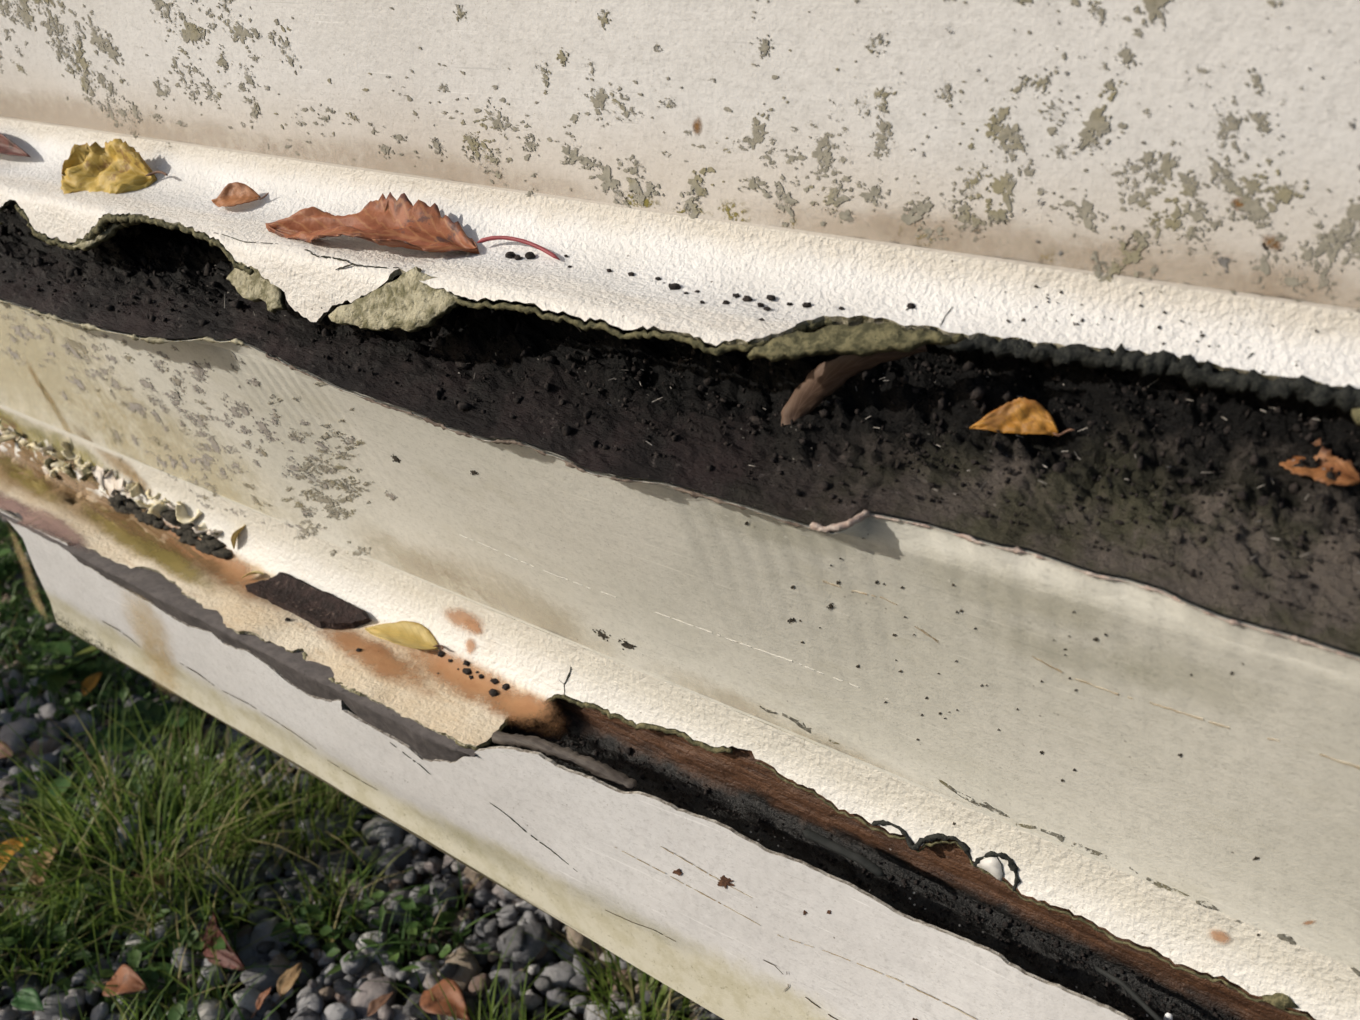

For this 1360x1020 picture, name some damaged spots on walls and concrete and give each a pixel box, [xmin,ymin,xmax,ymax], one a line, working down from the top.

peeling [0,0,1360,317]
spalling [328,266,1360,427]
water stain [0,417,258,596]
peeling [0,299,1360,660]
corrosion [448,611,481,652]
spalling [455,716,518,750]
spalling [543,694,733,754]
peeling [717,875,734,889]
spalling [755,761,1265,1002]
corrosion [1211,931,1228,942]